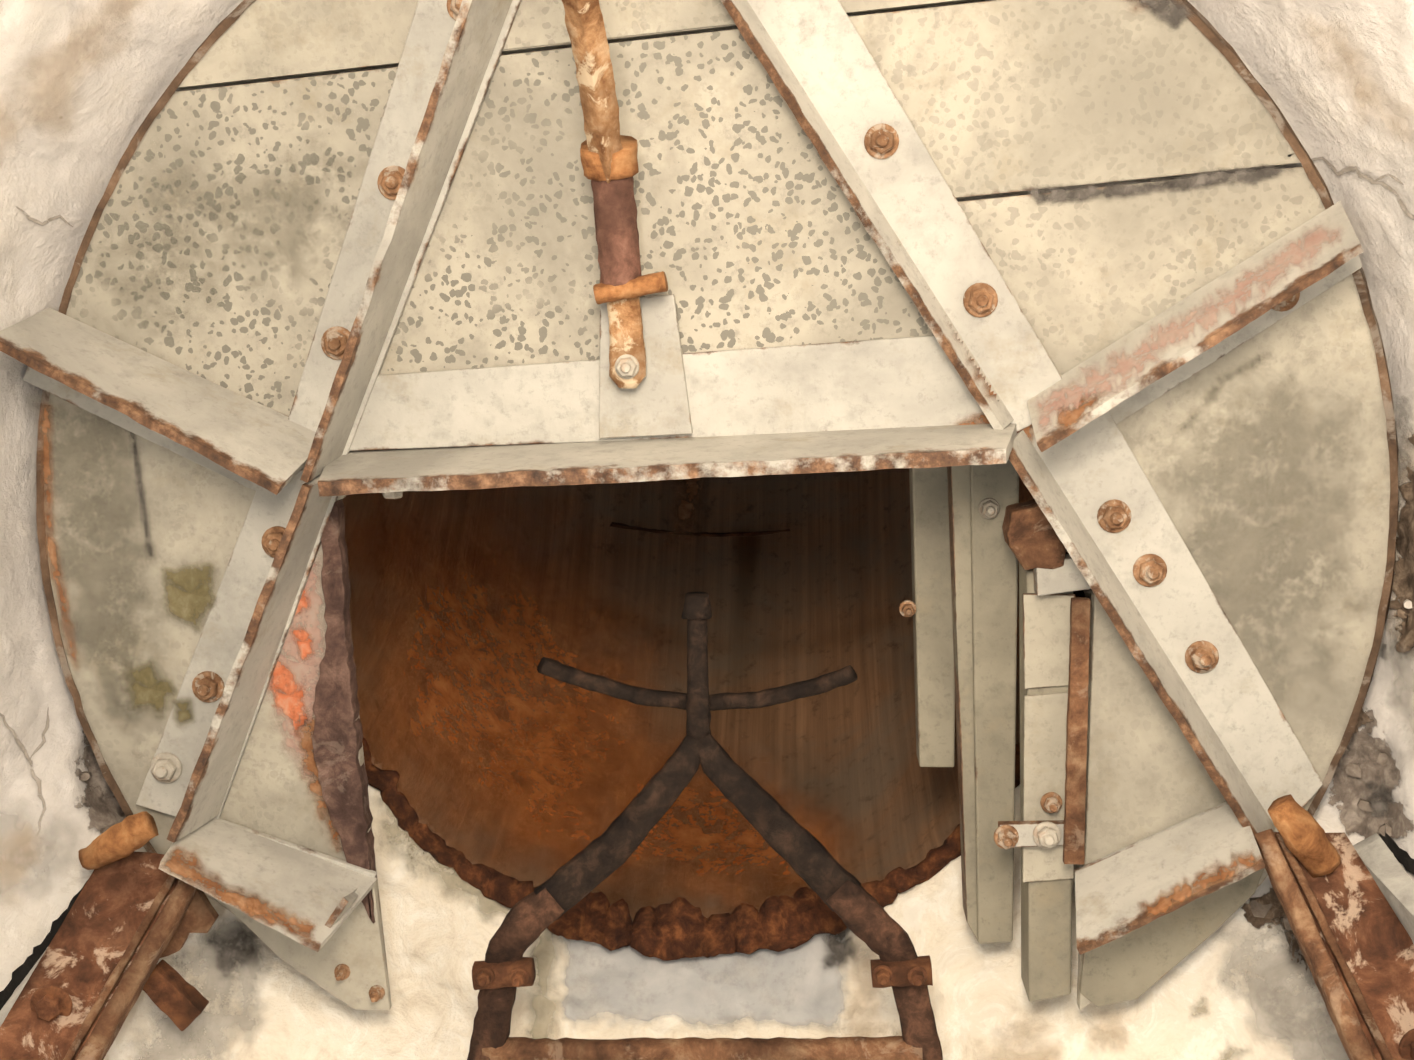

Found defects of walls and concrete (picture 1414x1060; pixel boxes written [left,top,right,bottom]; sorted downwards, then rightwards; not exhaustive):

crack [1311,157,1414,220]
rust [674,478,701,536]
spalling [1389,434,1414,656]
rust [362,737,538,908]
rust [861,824,961,908]
rust [547,887,847,961]